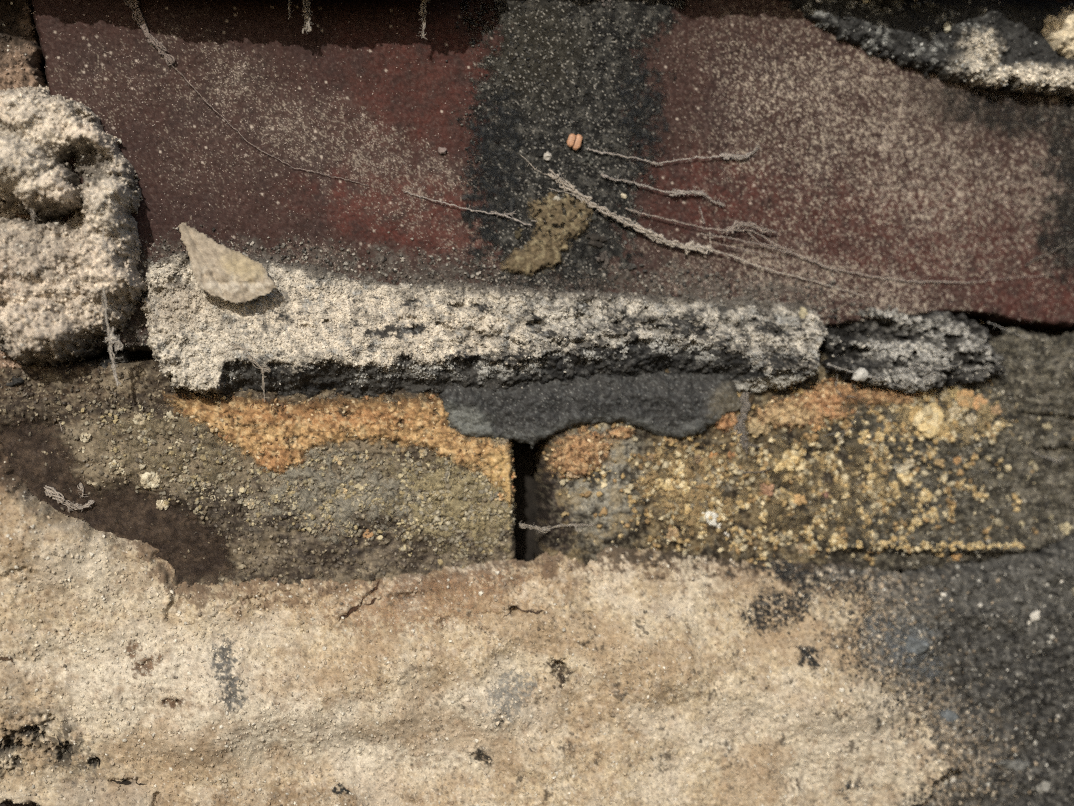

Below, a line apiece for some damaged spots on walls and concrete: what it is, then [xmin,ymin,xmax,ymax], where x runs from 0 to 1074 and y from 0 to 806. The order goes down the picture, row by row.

peeling [178,222,277,304]
spalling [0,416,234,589]
leakage [78,397,516,570]
efflorescence [542,380,1072,567]